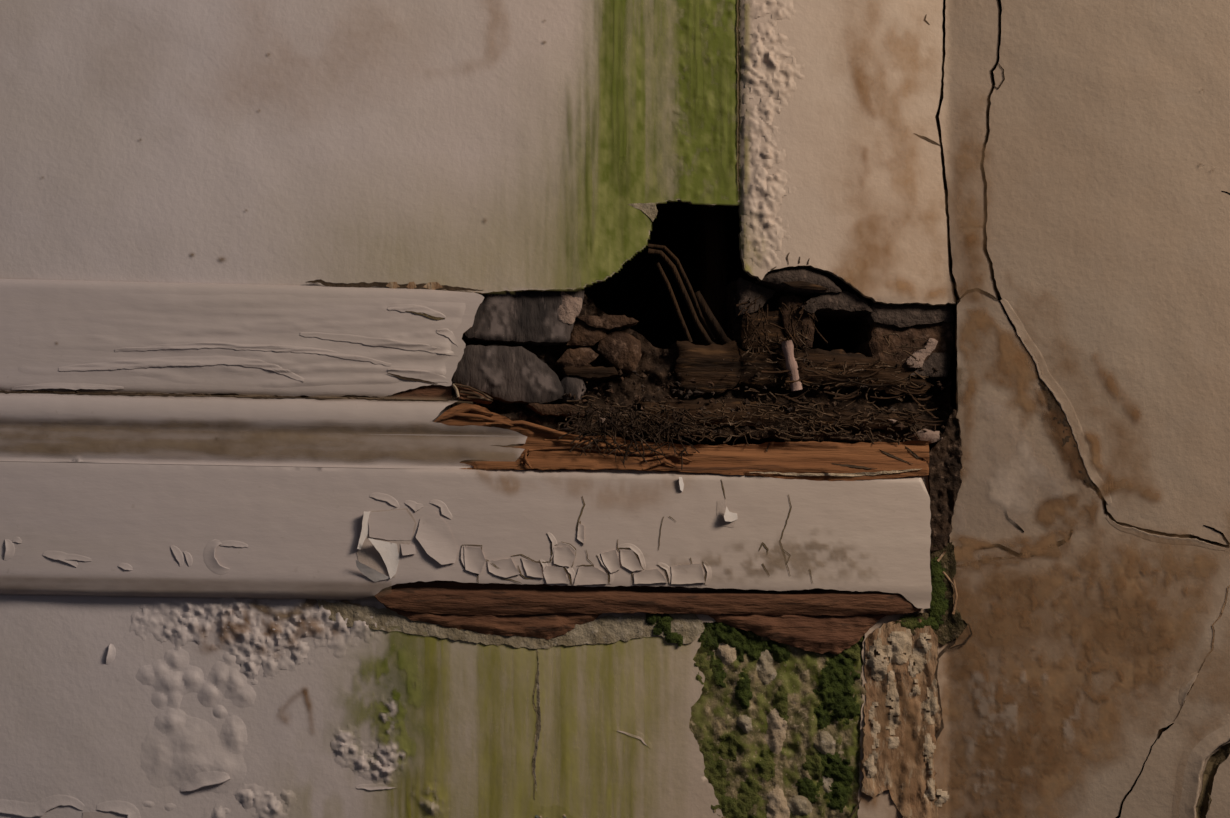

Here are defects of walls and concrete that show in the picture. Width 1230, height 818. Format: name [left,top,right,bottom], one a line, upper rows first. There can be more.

peeling [628,203,658,222]
crack [0,373,449,401]
crack [305,279,483,320]
spalling [451,290,585,405]
spalling [855,322,954,372]
crack [914,0,1230,551]
leakage [938,276,1218,818]
leakage [252,599,317,619]
flaking render [318,409,968,818]
leakage [331,692,409,784]
crack [934,624,972,740]
crack [1115,585,1230,818]